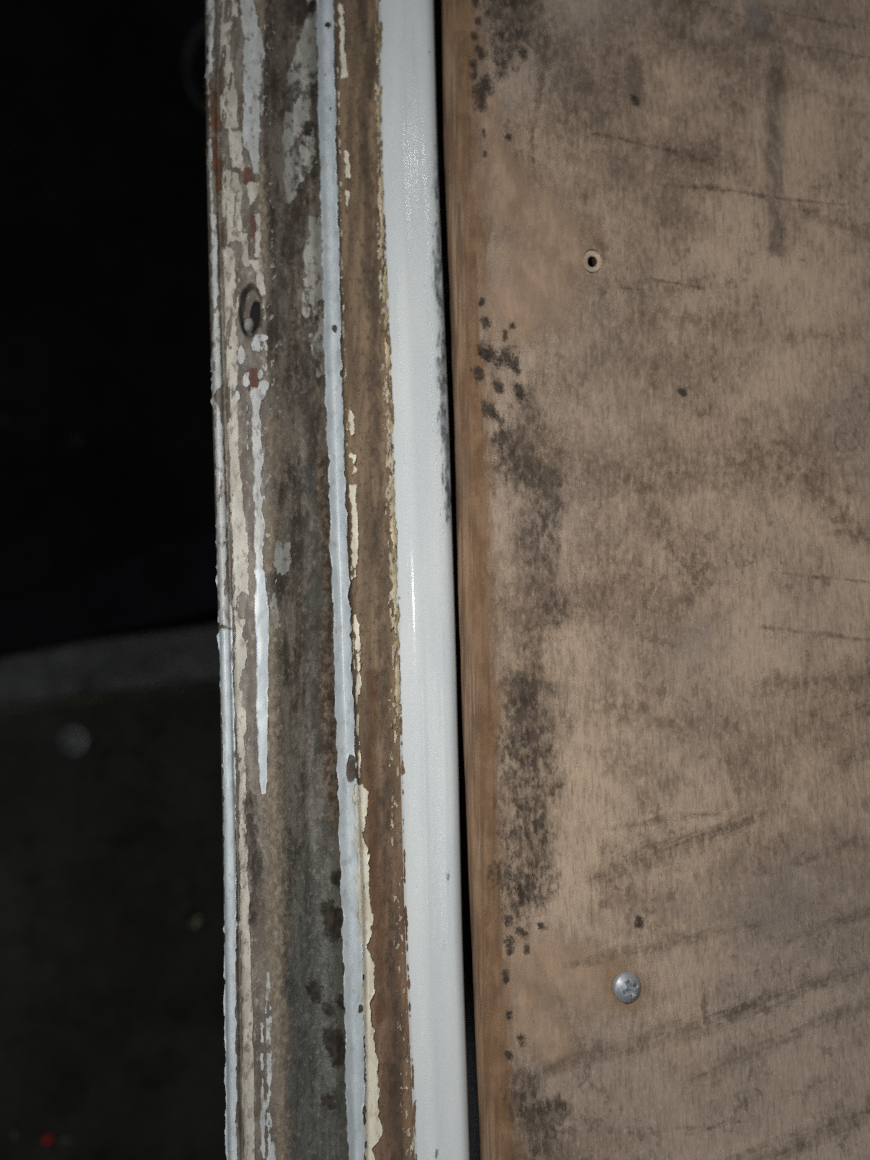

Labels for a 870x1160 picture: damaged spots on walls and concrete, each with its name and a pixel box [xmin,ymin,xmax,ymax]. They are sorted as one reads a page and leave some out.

peeling [205,0,383,1160]
peeling [374,0,417,1160]
leakage [451,0,570,1160]